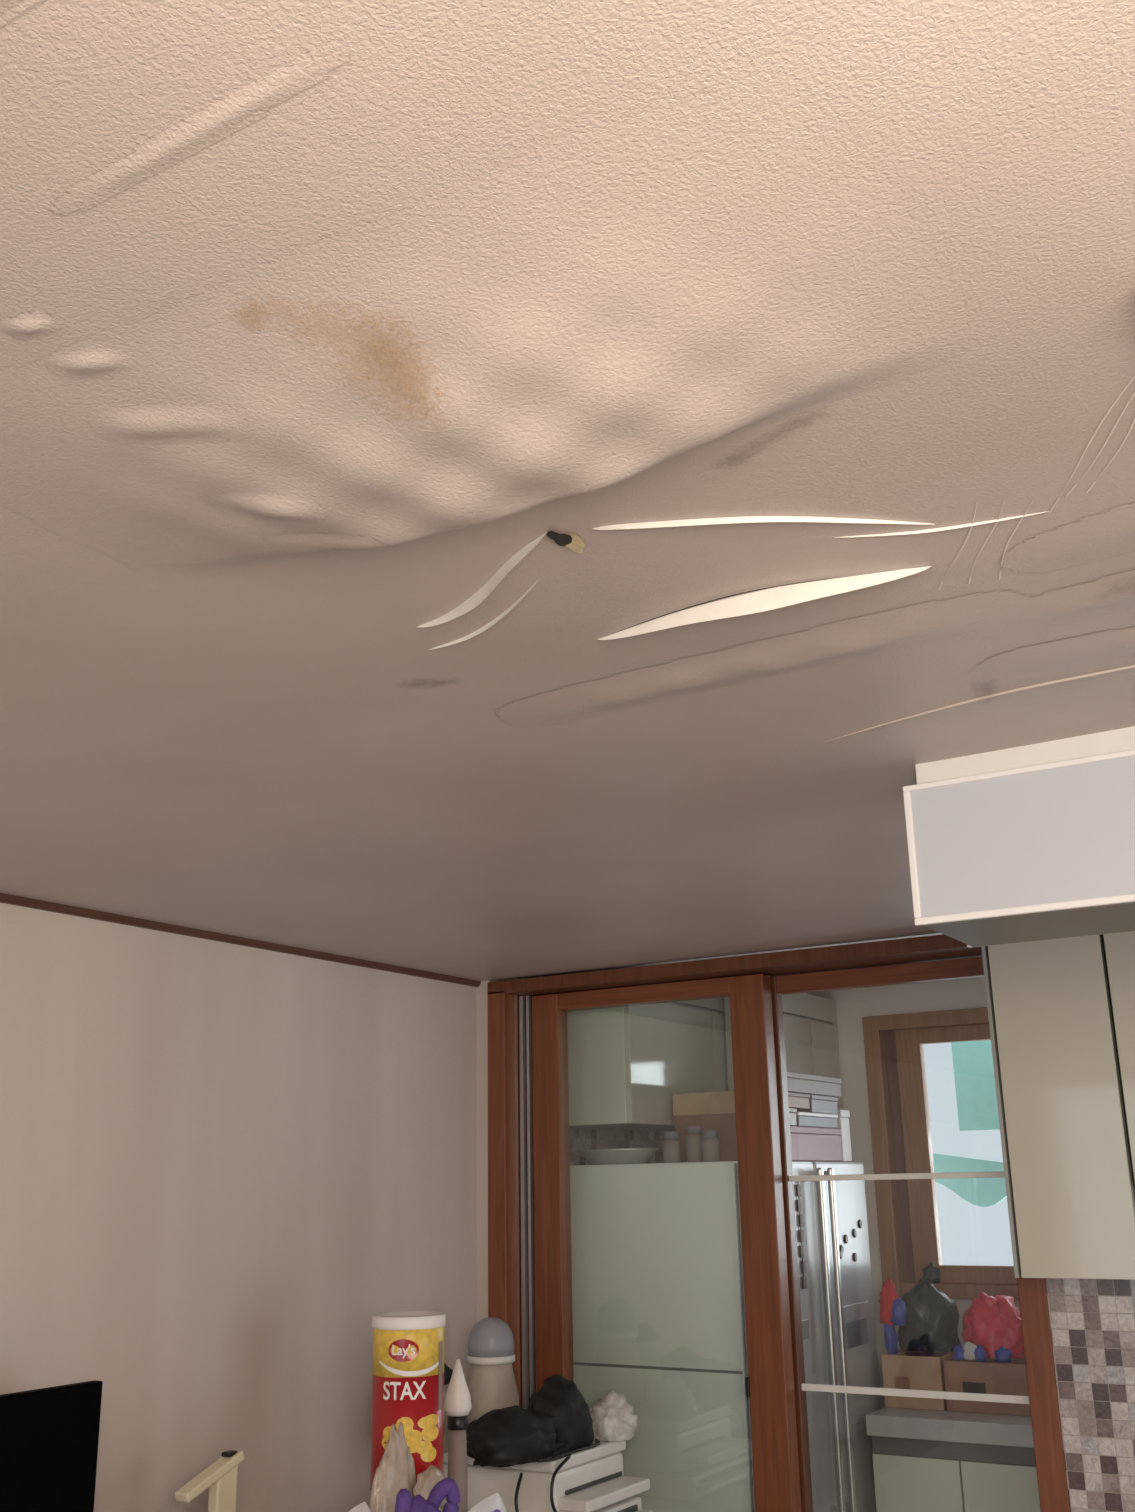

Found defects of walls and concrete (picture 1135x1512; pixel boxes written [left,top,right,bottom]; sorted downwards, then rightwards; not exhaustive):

spalling [547,531,572,546]